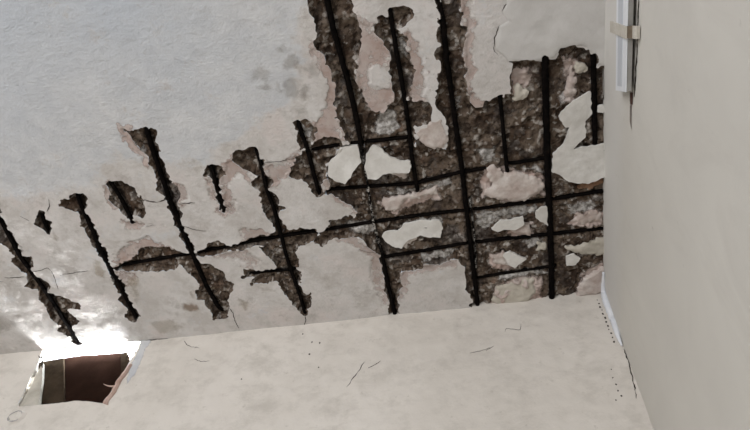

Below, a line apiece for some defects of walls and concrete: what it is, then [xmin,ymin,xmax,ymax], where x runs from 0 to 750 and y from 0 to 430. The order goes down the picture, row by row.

spalling [0,209,82,345]
spalling [58,0,605,322]